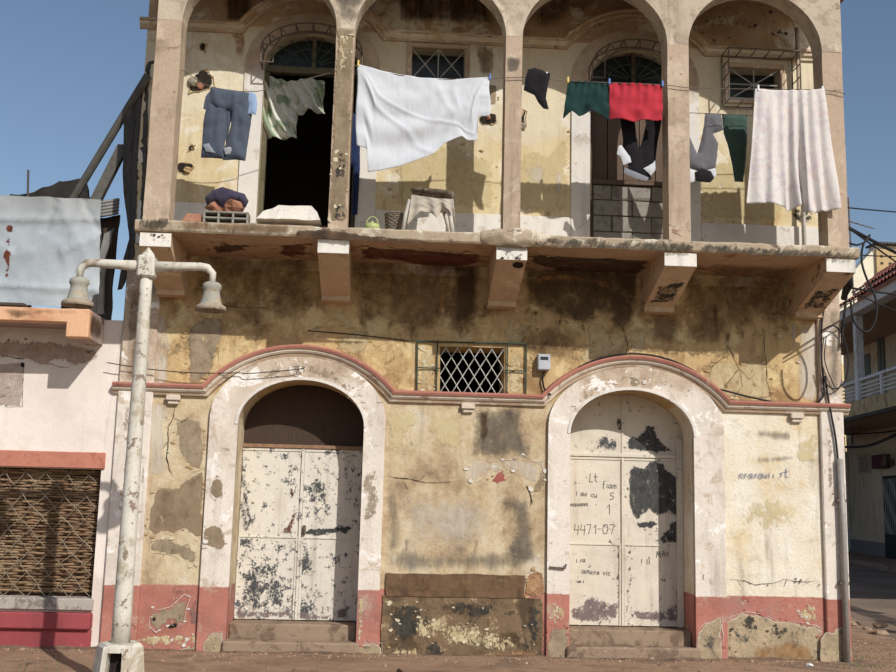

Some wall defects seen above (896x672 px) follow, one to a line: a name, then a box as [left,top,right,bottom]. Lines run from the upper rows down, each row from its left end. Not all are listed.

damp [338,0,360,17]
flaking render [292,29,426,249]
damp [353,262,476,331]
damp [527,269,636,327]
flaking render [0,338,96,407]
crack [708,337,782,399]
crack [163,408,187,472]
damp [475,410,529,454]
flaking render [138,418,228,568]
peeling [236,456,417,654]
flaking render [414,611,514,653]
flaking render [698,595,854,662]